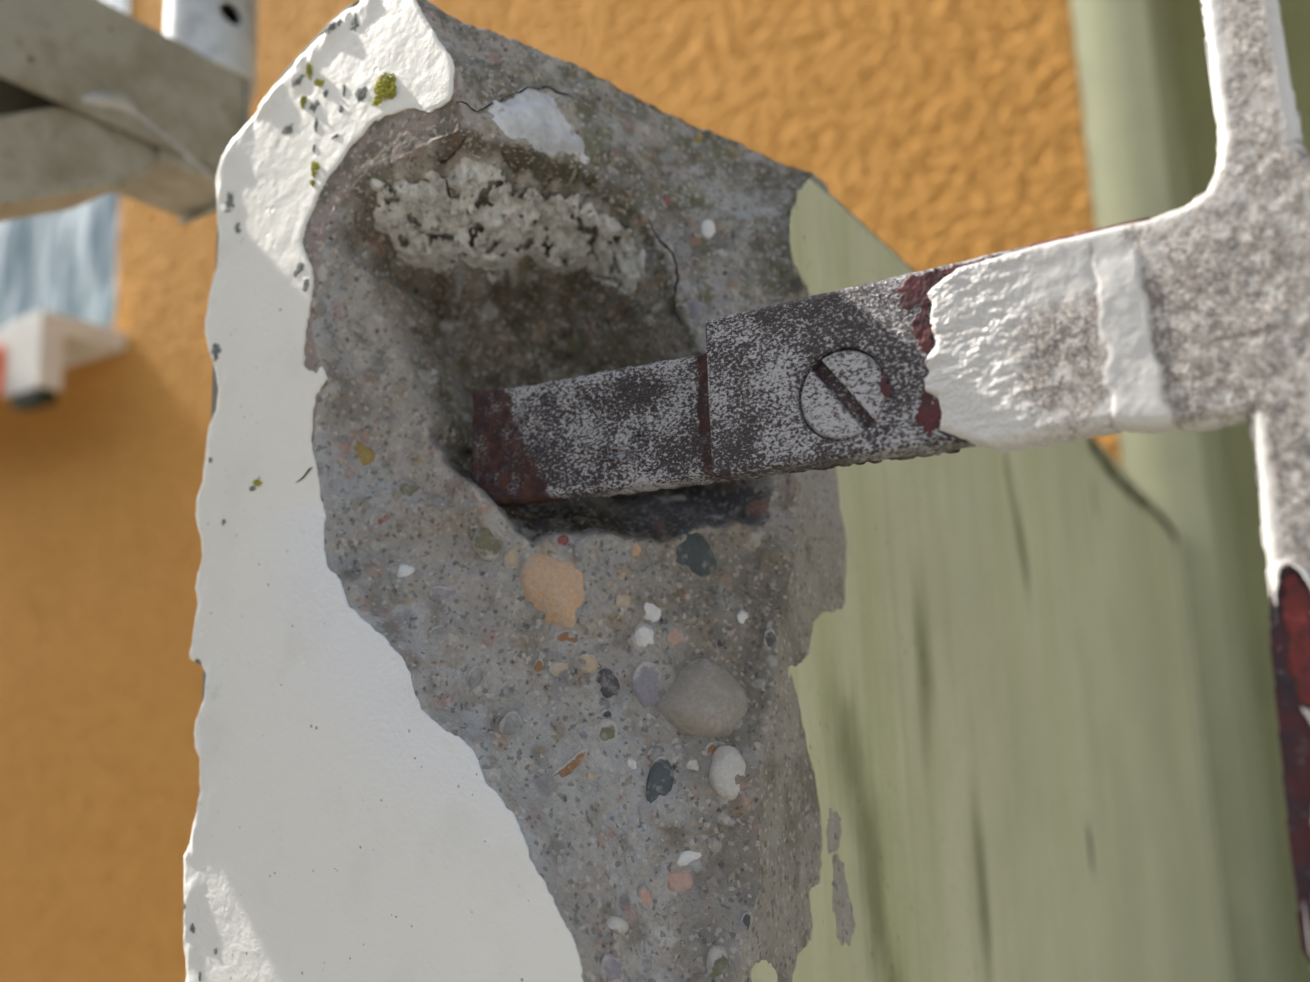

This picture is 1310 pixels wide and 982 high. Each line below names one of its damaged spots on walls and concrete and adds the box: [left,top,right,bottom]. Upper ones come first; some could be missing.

spalling [303,0,855,982]